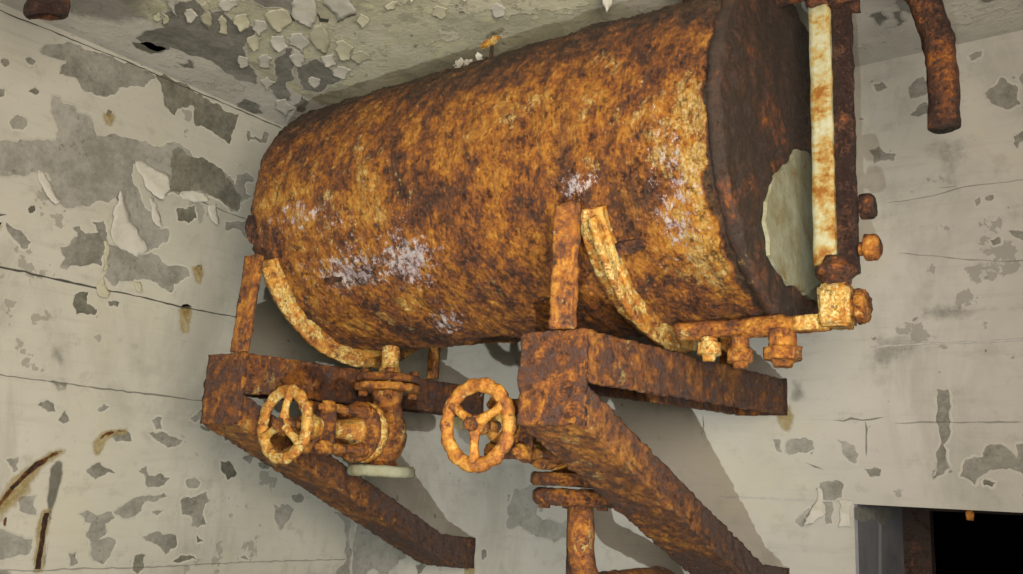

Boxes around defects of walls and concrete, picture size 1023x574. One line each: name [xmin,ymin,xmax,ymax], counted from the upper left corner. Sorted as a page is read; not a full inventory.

peeling [131,0,372,120]
peeling [982,71,1023,112]
peeling [0,40,270,317]
rust [180,308,191,332]
rust [94,430,126,454]
peeling [931,387,1023,489]
peeling [85,460,117,481]
peeling [219,454,271,482]
spalling [0,451,62,574]
peeling [67,464,211,574]
peeling [272,491,305,531]